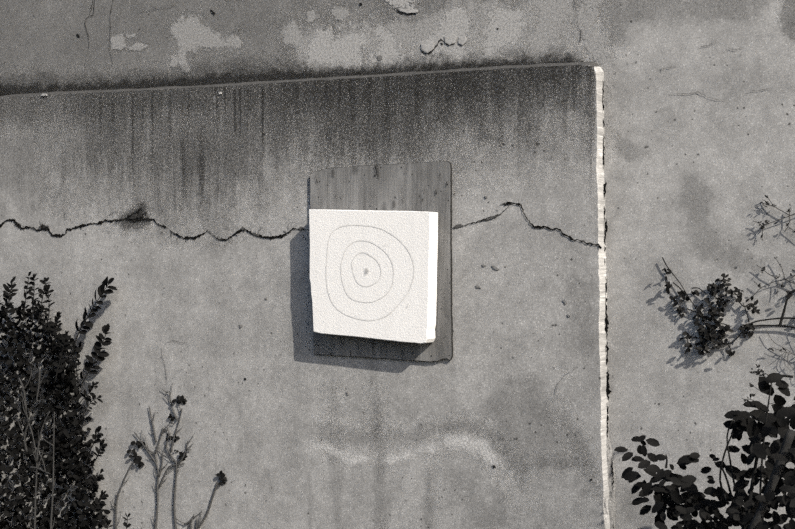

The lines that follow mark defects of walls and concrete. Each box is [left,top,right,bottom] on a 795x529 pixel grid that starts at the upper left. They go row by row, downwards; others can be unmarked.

crack [83,0,113,86]
peeling [170,15,242,73]
peeling [282,0,617,106]
crack [0,203,307,243]
crack [453,80,614,487]